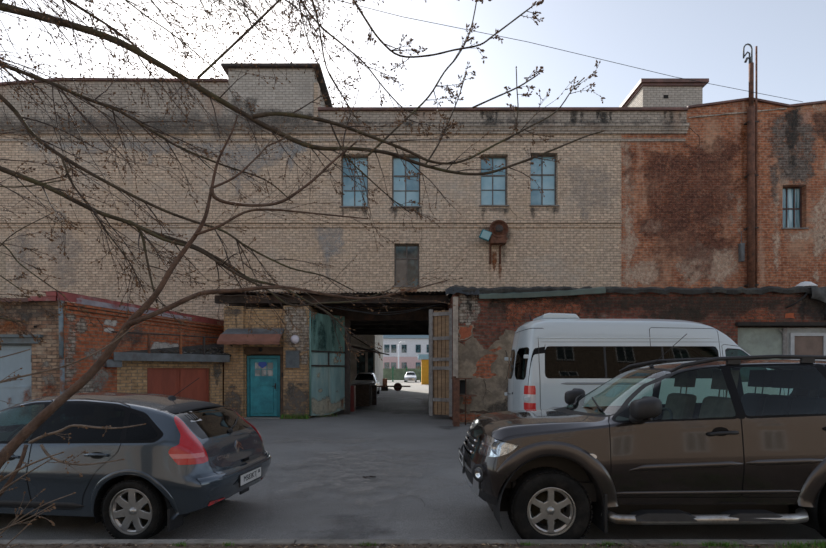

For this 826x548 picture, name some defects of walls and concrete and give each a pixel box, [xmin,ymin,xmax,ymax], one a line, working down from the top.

water stain [619,139,742,288]
peeling [458,295,480,341]